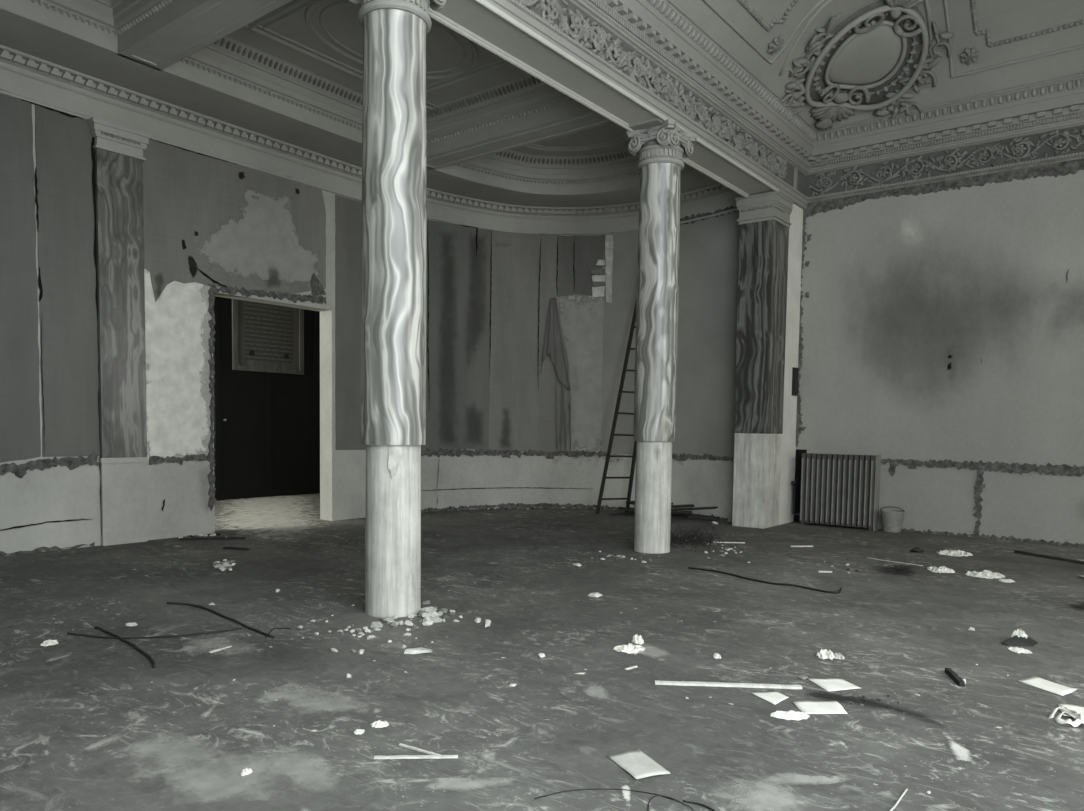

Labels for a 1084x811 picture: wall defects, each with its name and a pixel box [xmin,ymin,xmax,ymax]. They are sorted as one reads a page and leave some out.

crack [0,89,98,318]
crack [39,329,47,454]
spalling [0,453,100,478]
crack [95,359,103,439]
flaking render [144,189,326,511]
flaking render [421,294,618,460]
spalling [672,453,733,462]
spalling [796,151,1084,447]
spalling [881,458,1084,547]